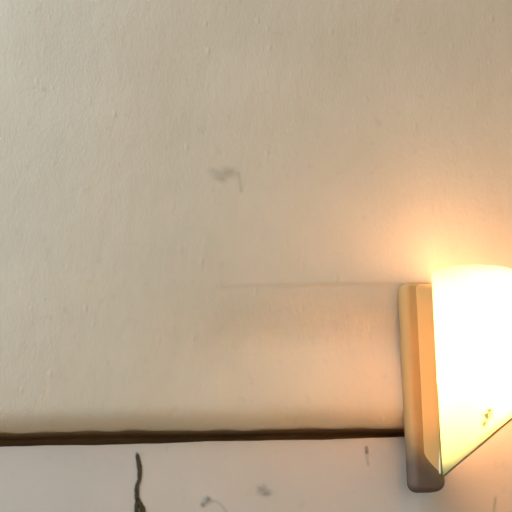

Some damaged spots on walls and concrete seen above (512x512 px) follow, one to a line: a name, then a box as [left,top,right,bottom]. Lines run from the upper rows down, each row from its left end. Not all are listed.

crack [134,452,146,512]